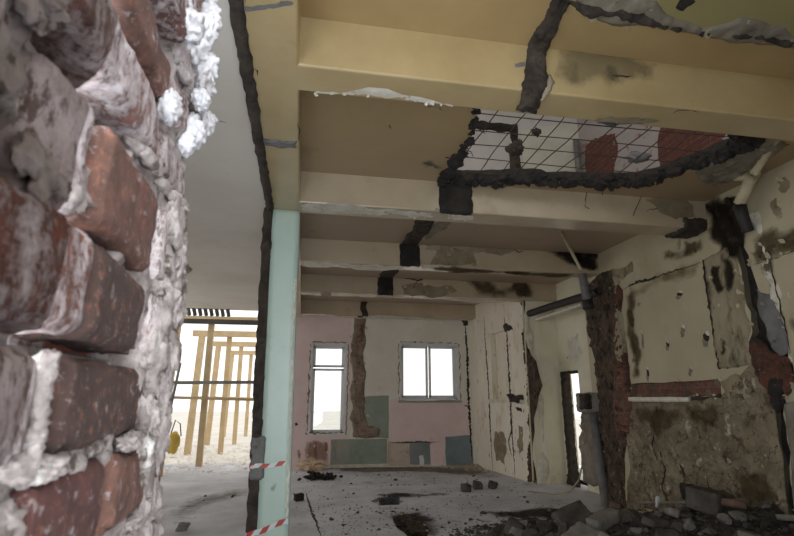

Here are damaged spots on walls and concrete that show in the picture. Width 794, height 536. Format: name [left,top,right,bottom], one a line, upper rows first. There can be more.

peeling [314,87,453,110]
spalling [437,108,790,220]
peeling [394,281,510,303]
flaking render [747,211,794,400]
leakage [755,230,794,272]
spalling [285,279,376,517]
flaking render [398,341,462,400]
spalling [494,301,550,485]